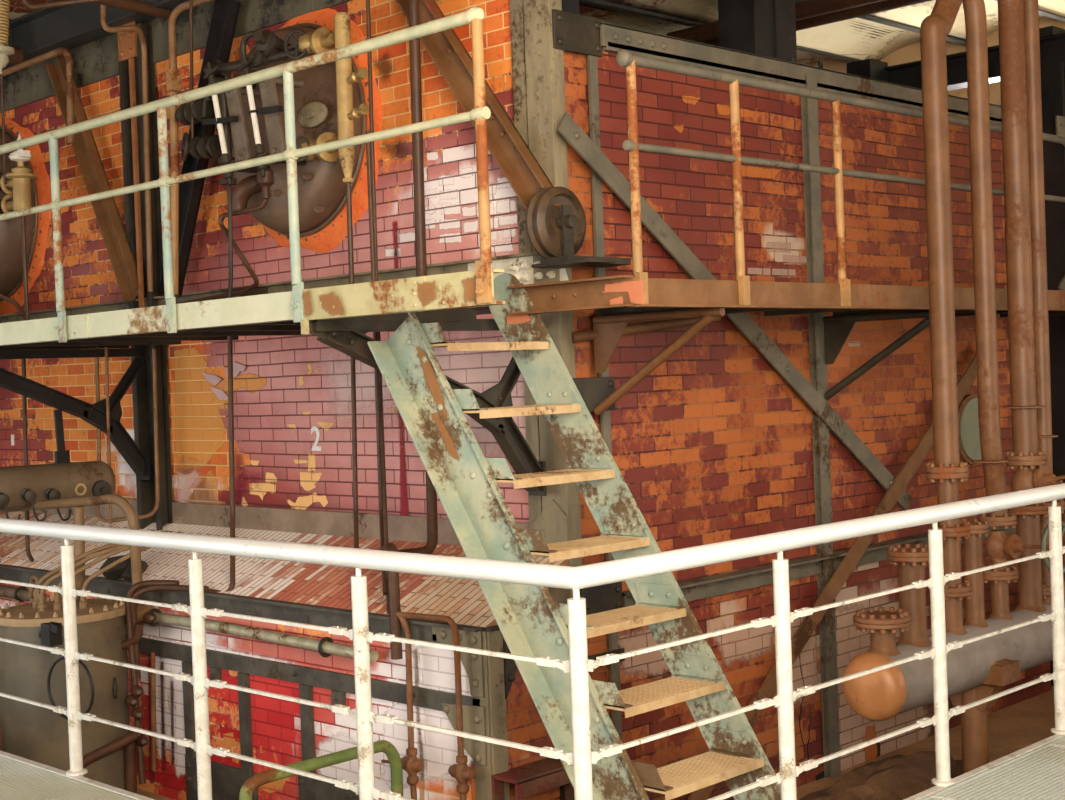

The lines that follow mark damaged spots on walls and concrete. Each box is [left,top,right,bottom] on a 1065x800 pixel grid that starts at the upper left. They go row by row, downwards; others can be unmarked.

rust [302,291,344,316]
rust [417,280,436,307]
rust [462,276,476,302]
peeling [174,347,267,505]
rust [416,347,459,461]
peeling [241,460,277,506]
peeling [288,456,328,510]
peeling [260,779,287,793]